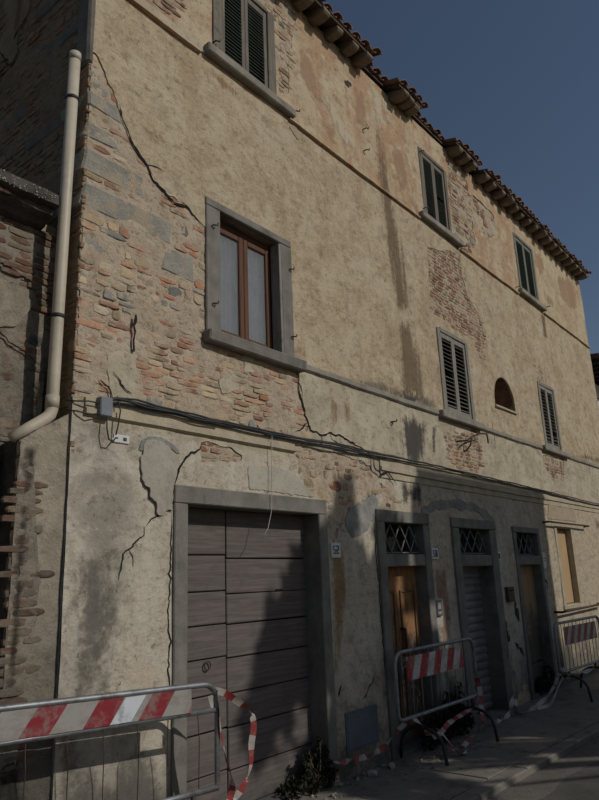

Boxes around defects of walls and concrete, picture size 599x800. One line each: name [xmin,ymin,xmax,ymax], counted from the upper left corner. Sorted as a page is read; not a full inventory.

crack [120,107,204,226]
water stain [379,155,408,308]
flaking render [427,158,499,360]
flaking render [0,216,57,445]
crack [175,443,202,483]
flaking render [70,105,402,549]
crack [296,372,397,485]
water stain [402,324,423,401]
water stain [404,417,435,465]
flaking render [443,429,485,477]
water stain [79,562,114,696]
crack [118,515,172,686]